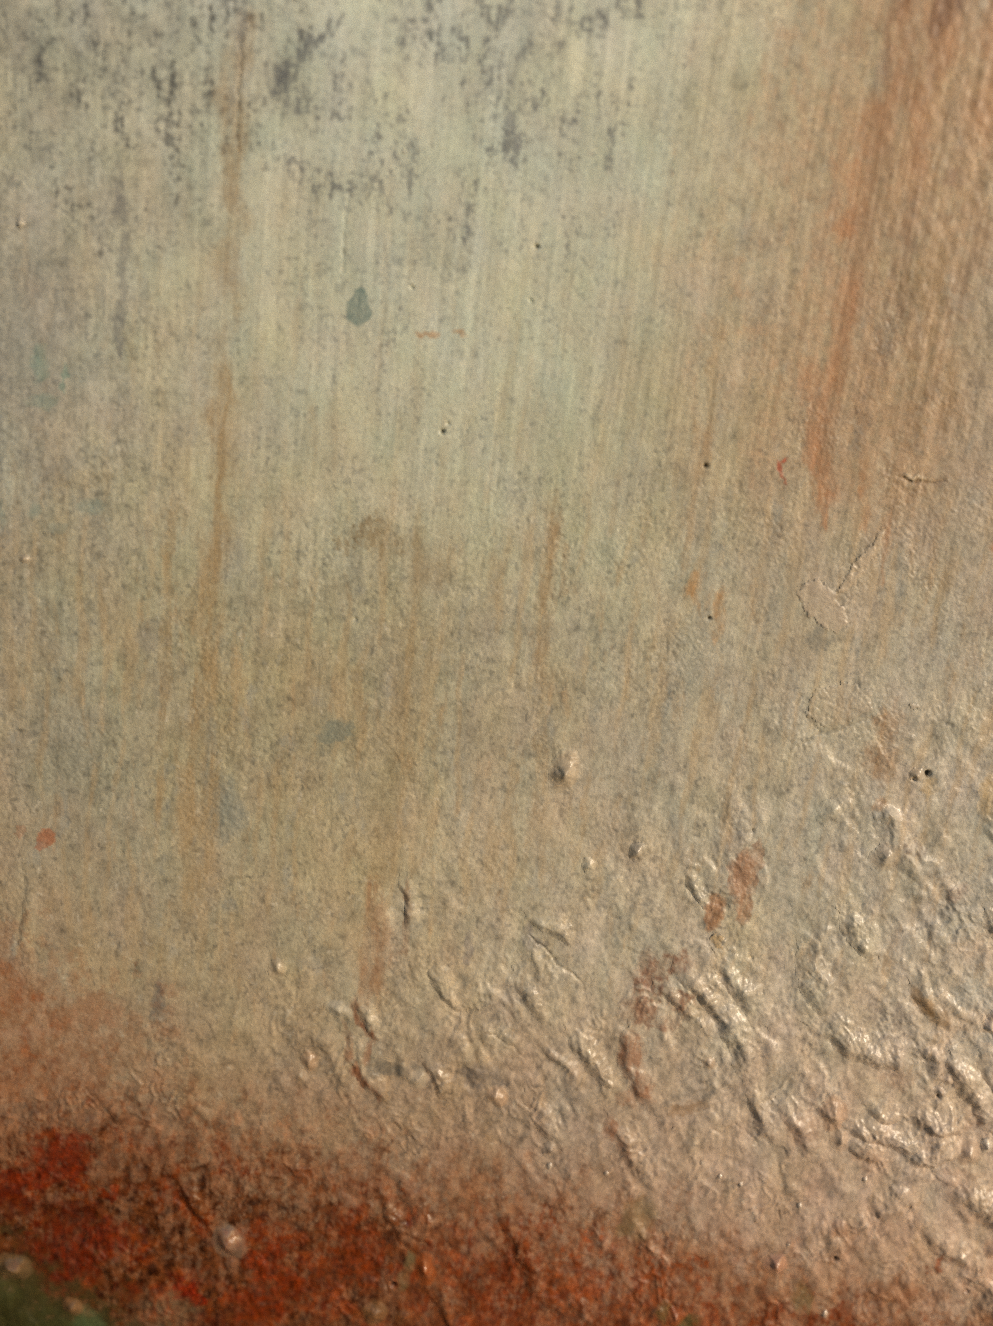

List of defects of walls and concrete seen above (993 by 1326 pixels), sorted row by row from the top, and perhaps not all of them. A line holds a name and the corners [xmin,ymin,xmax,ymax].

leakage [0,0,744,536]
corrosion [0,855,982,1326]